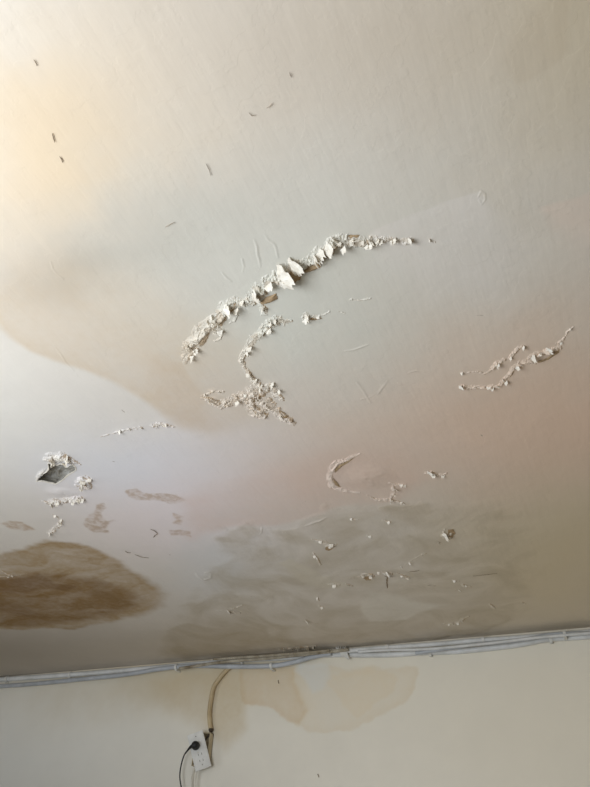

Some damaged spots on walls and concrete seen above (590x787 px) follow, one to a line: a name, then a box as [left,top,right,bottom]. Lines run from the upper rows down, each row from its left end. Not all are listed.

peeling [180,233,414,426]
peeling [458,326,574,391]
spalling [35,451,93,537]
peeling [326,453,406,505]
peeling [438,528,455,543]
water stain [0,439,553,759]